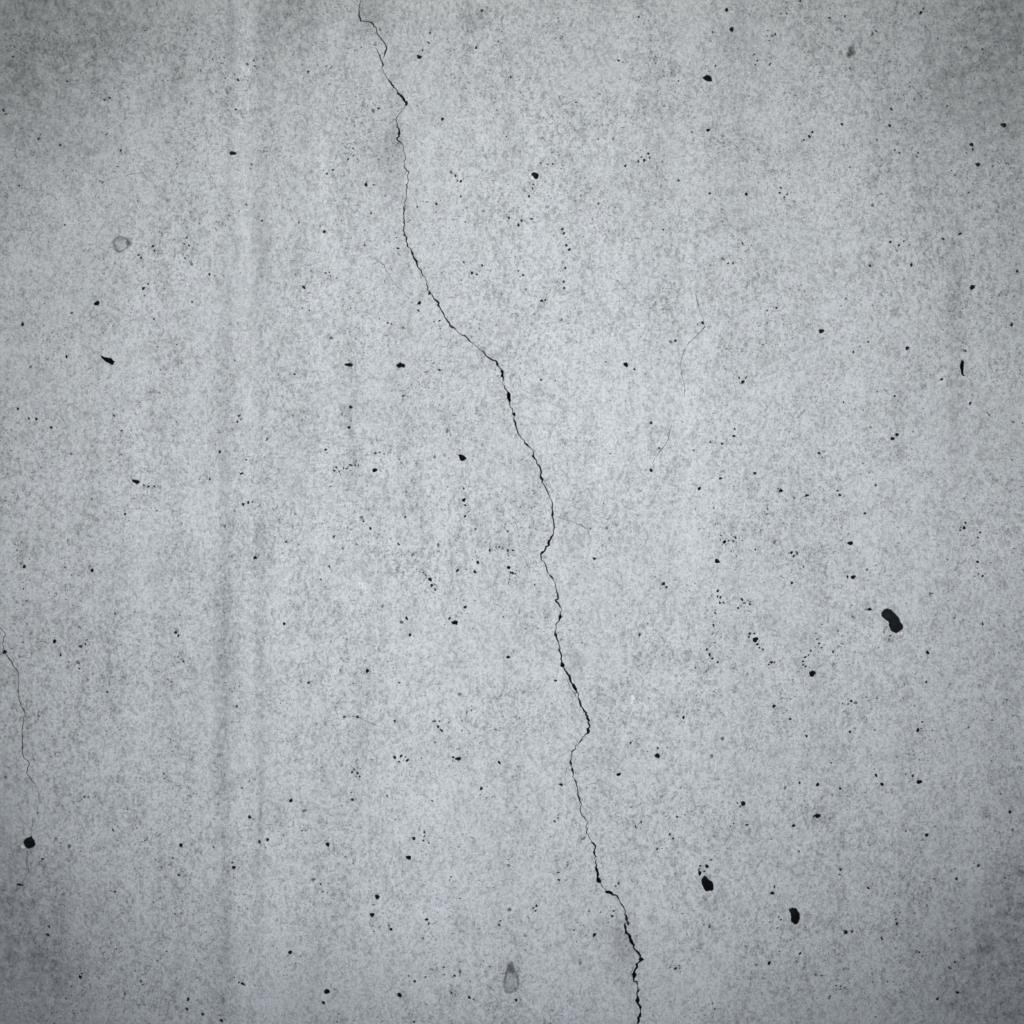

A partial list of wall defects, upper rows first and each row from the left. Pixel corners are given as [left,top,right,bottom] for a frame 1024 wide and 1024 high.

crack [358,0,644,1024]